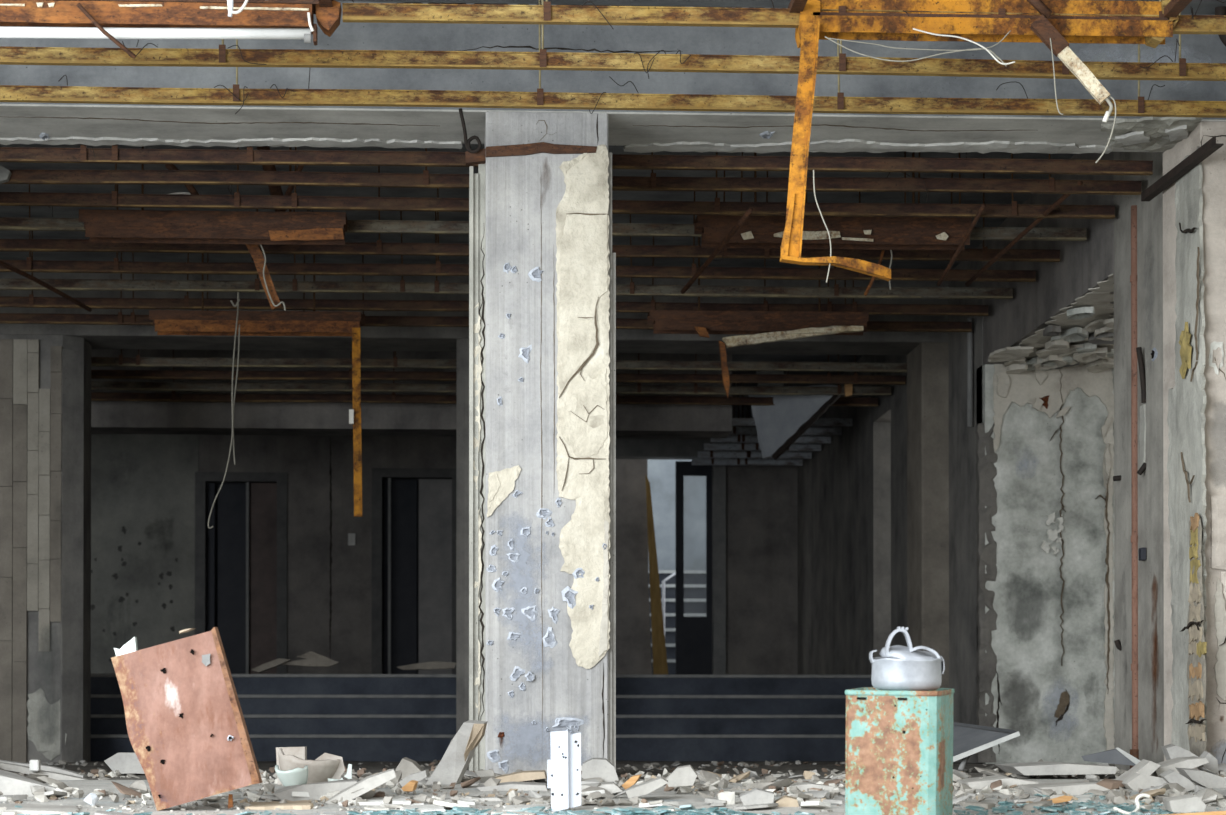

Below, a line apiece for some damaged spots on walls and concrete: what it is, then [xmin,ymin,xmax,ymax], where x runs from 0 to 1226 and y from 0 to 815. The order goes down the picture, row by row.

spalling [624,131,792,154]
spalling [464,724,509,773]
spalling [507,666,535,698]
peeling [486,144,610,669]
spalling [545,717,584,734]
crack [540,212,609,726]
spalling [809,117,1226,769]
crack [1050,373,1066,666]
crack [1096,478,1110,694]